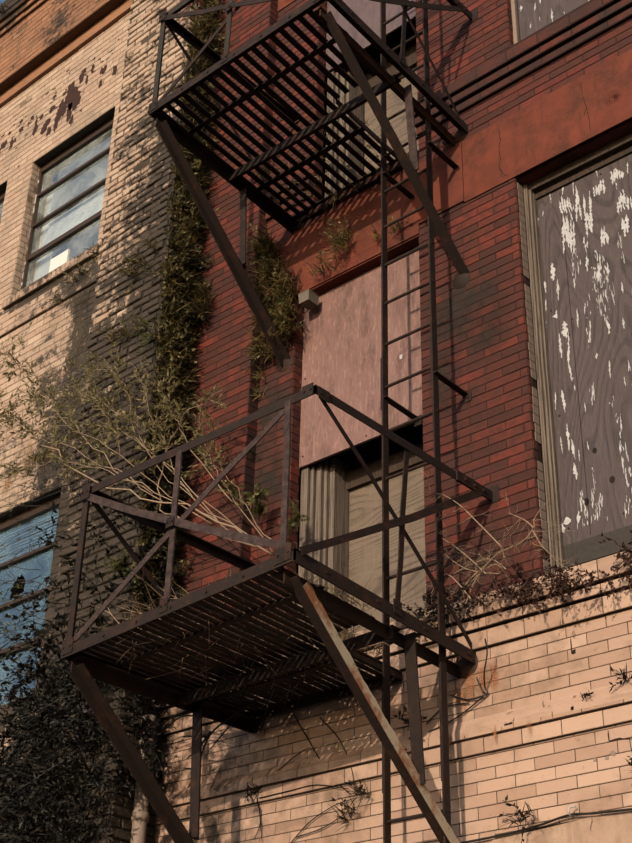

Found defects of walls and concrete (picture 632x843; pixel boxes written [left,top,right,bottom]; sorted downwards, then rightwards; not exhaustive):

peeling [0,50,117,151]
peeling [544,162,632,390]
peeling [560,425,589,480]
peeling [562,467,608,533]
peeling [609,397,632,517]